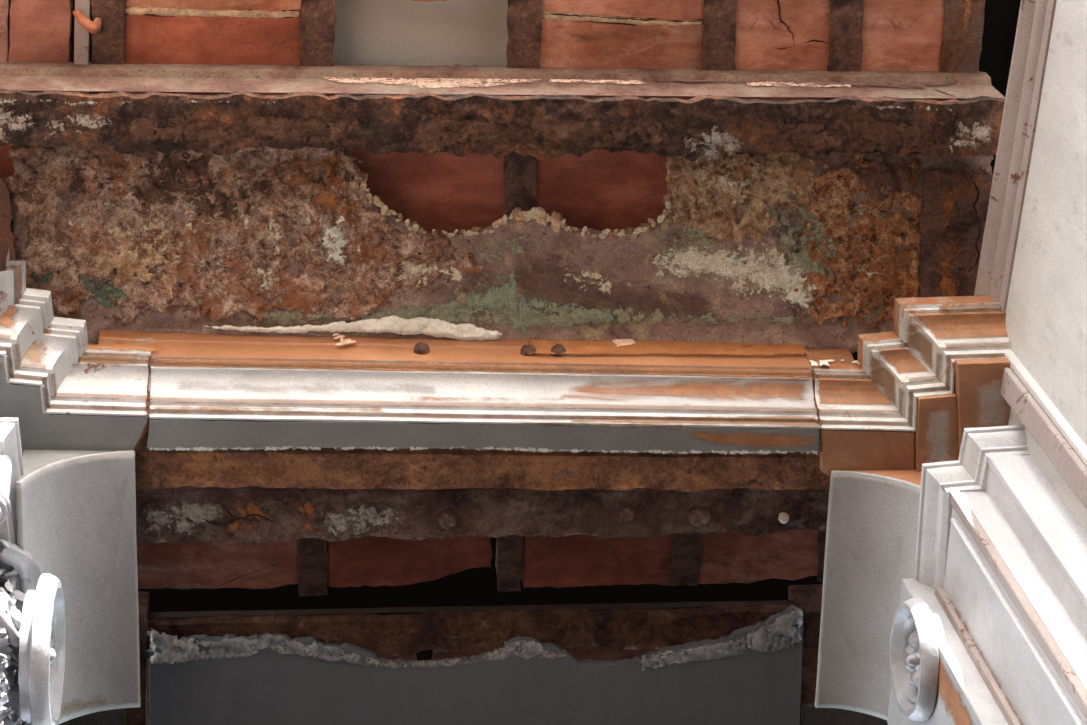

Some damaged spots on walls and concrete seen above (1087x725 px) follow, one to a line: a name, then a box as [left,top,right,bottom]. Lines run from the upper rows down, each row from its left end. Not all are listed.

crack [774,0,827,50]
rust [0,104,112,146]
rust [684,126,743,161]
rust [948,118,996,155]
rust [50,152,357,298]
flaking render [356,177,673,239]
damp [562,265,630,294]
damp [652,236,820,315]
rust [0,183,1011,447]
rust [141,500,270,536]
peeling [147,628,567,669]
peeling [639,610,803,671]